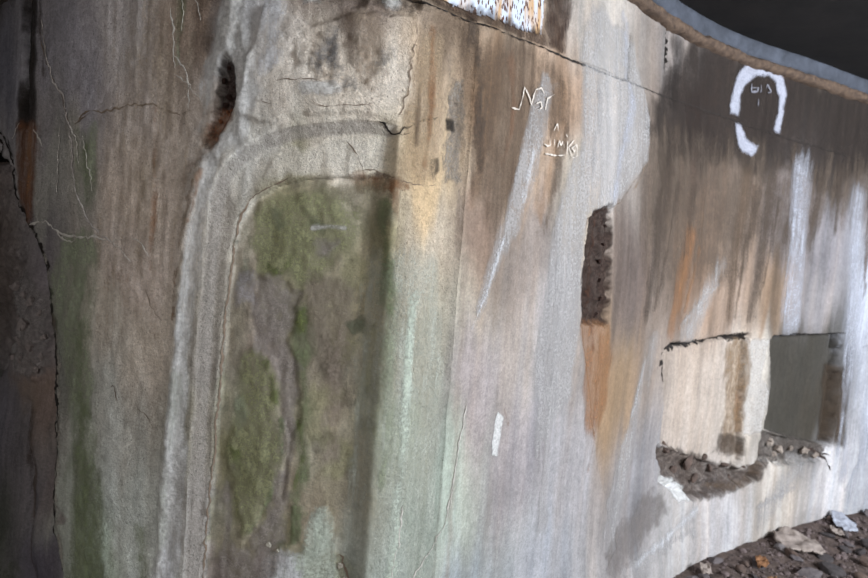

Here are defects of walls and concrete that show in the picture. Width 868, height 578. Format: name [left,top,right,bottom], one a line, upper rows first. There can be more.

leakage [18,0,40,128]
crack [280,0,848,156]
rust [16,121,36,219]
crack [0,0,202,537]
crack [203,178,288,578]
leakage [400,300,416,455]
leakage [472,33,570,311]
rust [580,206,613,431]
leakage [535,11,868,443]
rust [717,339,749,454]
spalling [655,339,824,501]
leakage [266,508,335,578]